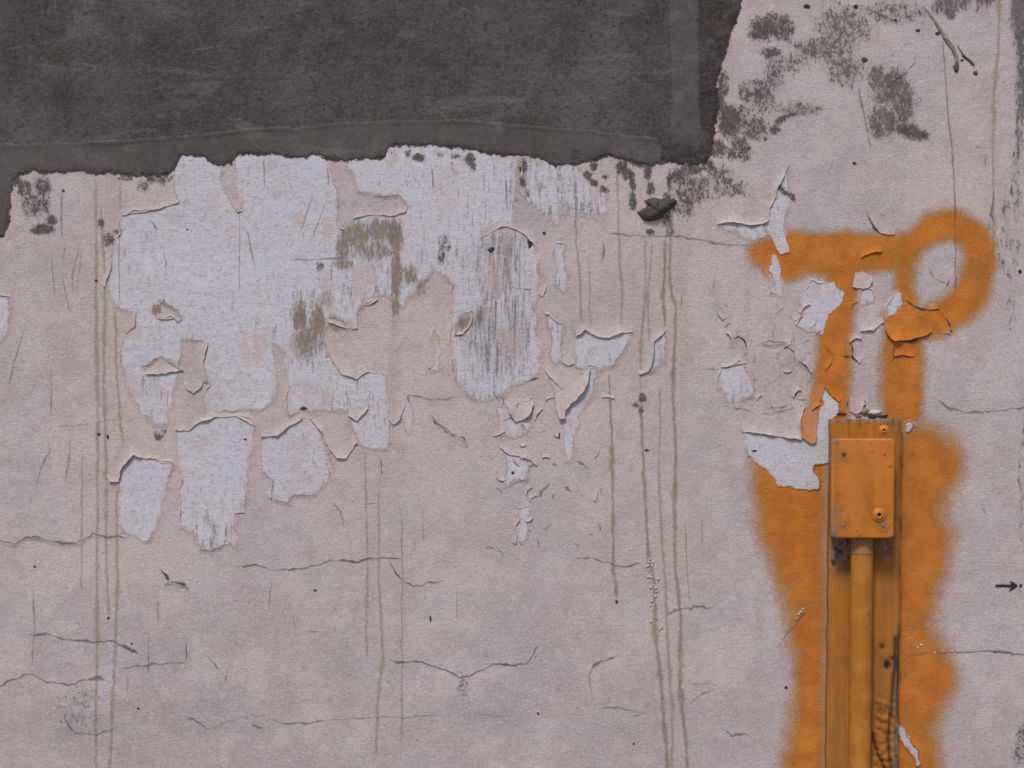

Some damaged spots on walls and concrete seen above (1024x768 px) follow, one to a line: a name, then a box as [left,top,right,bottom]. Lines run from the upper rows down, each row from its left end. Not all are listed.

leakage [13,176,57,235]
peeling [715,162,908,336]
peeling [95,144,671,555]
peeling [713,355,759,404]
peeling [741,382,844,493]
crack [0,532,124,548]
crack [243,557,438,586]
crack [0,633,227,686]
crack [393,647,537,678]